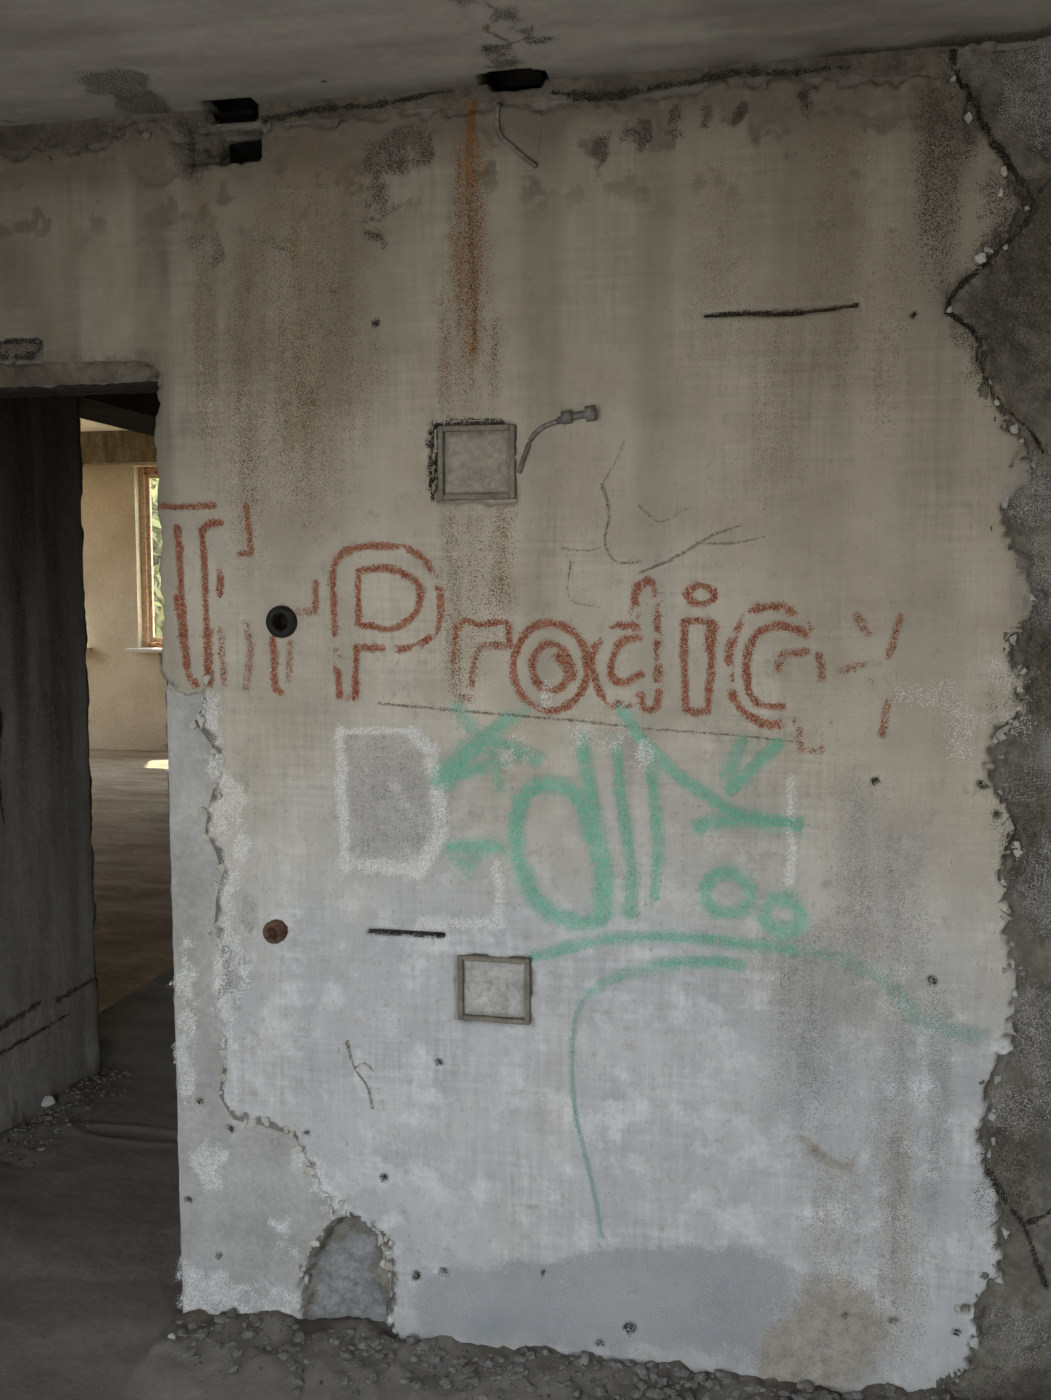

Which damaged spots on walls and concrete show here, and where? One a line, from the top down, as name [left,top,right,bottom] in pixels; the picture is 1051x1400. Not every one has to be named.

flaking render [0,337,158,387]
flaking render [0,66,223,161]
corrosion [434,99,505,426]
peeling [450,0,553,70]
flaking render [234,40,1051,1400]
flaking render [158,646,395,1329]